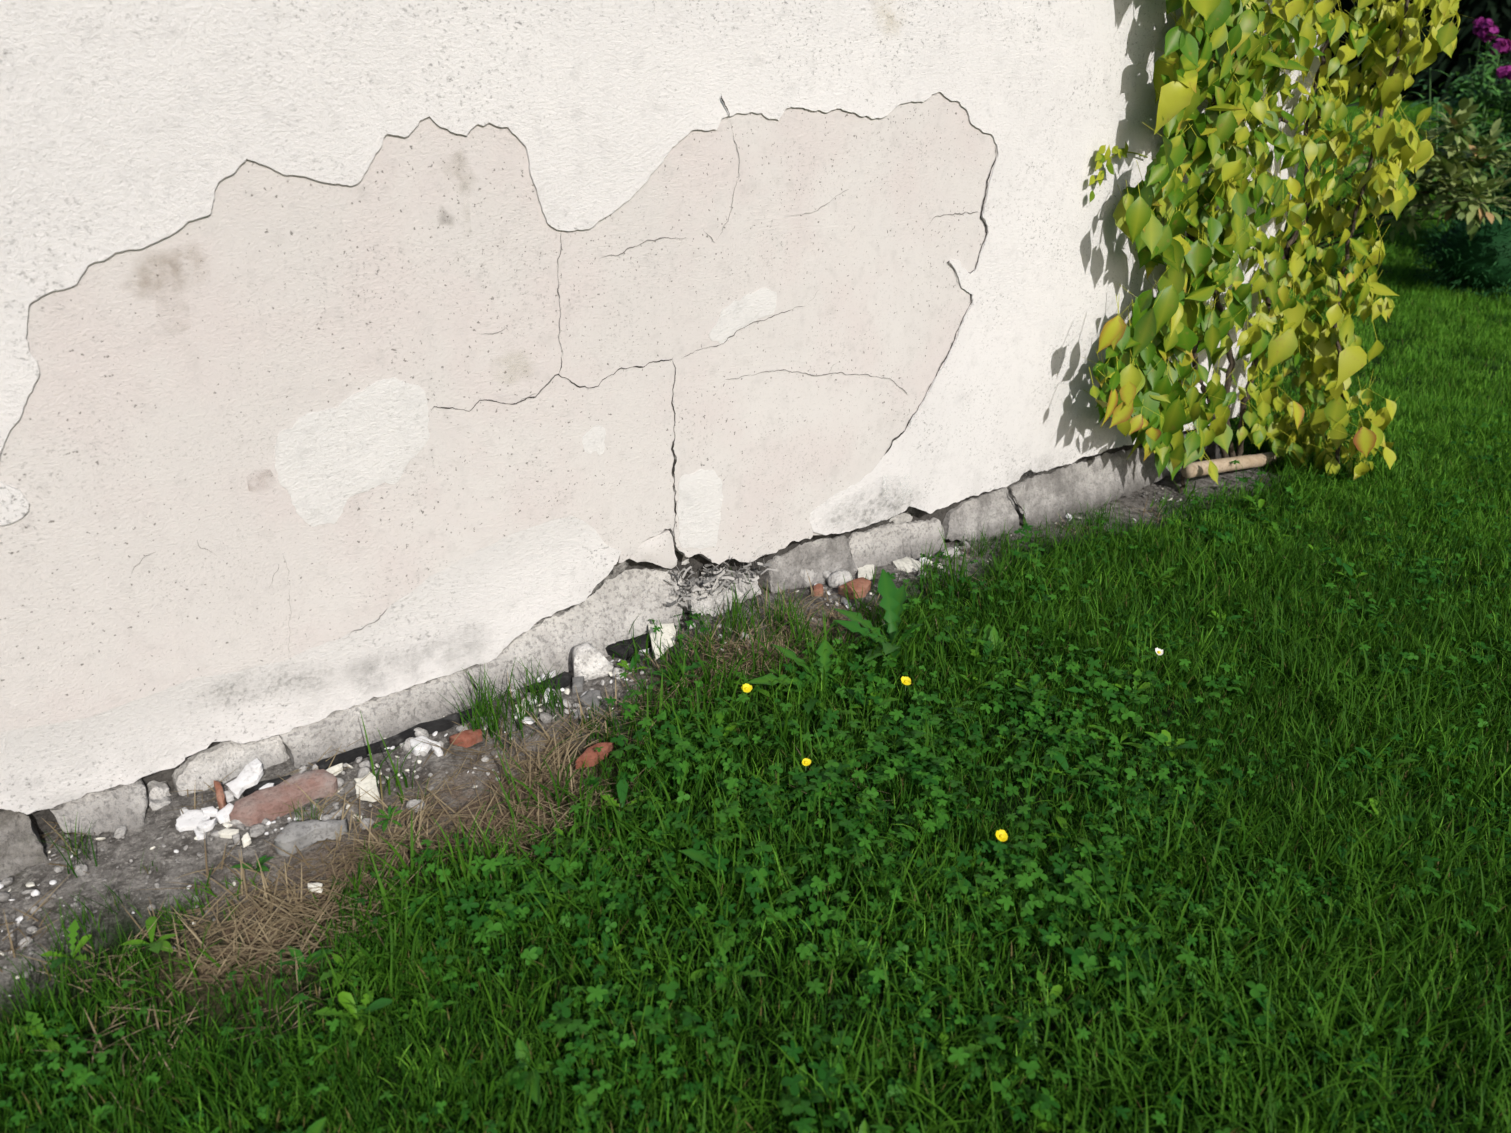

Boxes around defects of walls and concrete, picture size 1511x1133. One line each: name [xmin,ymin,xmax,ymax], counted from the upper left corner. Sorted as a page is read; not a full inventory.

crack [605,94,740,257]
flaking render [0,92,997,732]
crack [432,147,997,545]
flaking render [175,758,275,848]
flaking render [326,763,380,802]
flaking render [410,736,443,757]